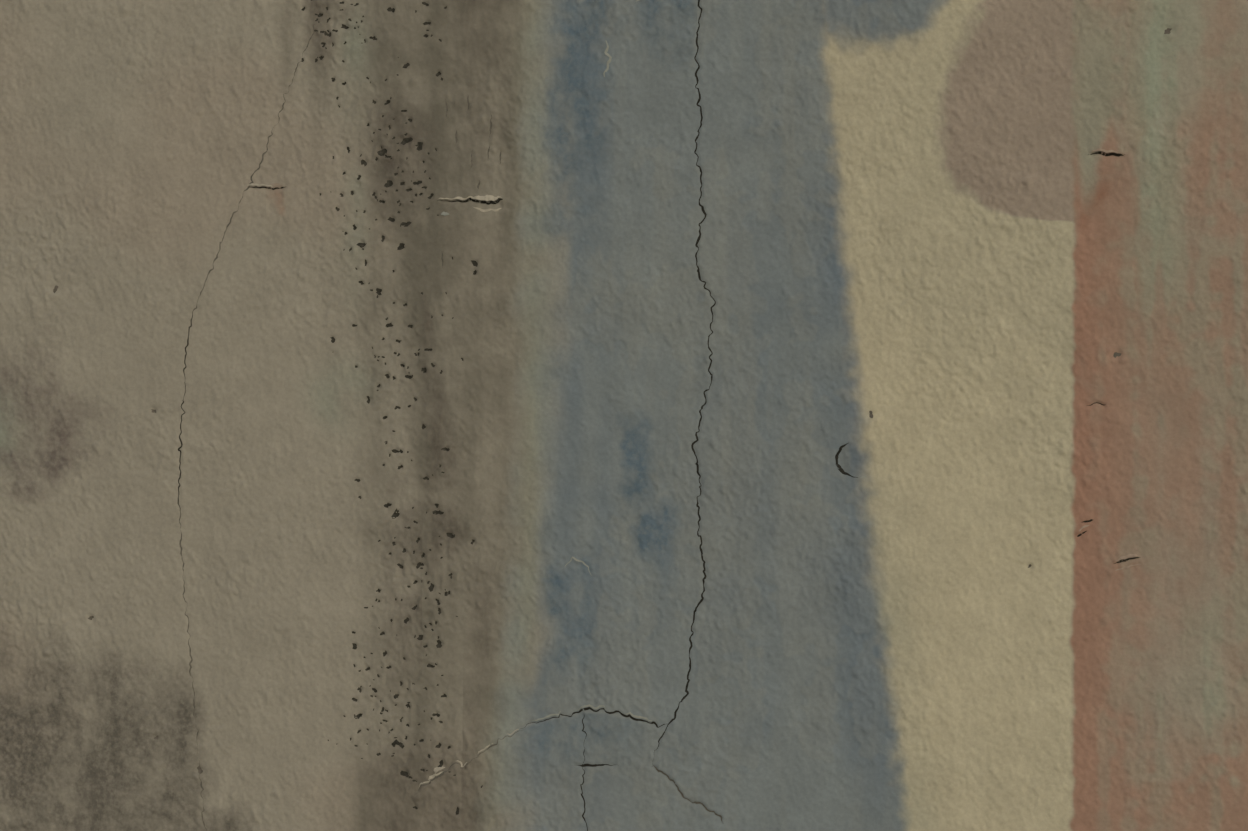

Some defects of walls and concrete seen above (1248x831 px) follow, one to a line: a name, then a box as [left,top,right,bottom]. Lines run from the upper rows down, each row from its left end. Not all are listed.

damp [301,0,362,80]
hole [301,0,377,62]
damp [358,0,517,237]
spalling [319,98,503,404]
crack [178,8,320,831]
spalling [382,397,417,469]
damp [355,292,512,831]
crack [418,0,724,831]
spalling [835,443,866,478]